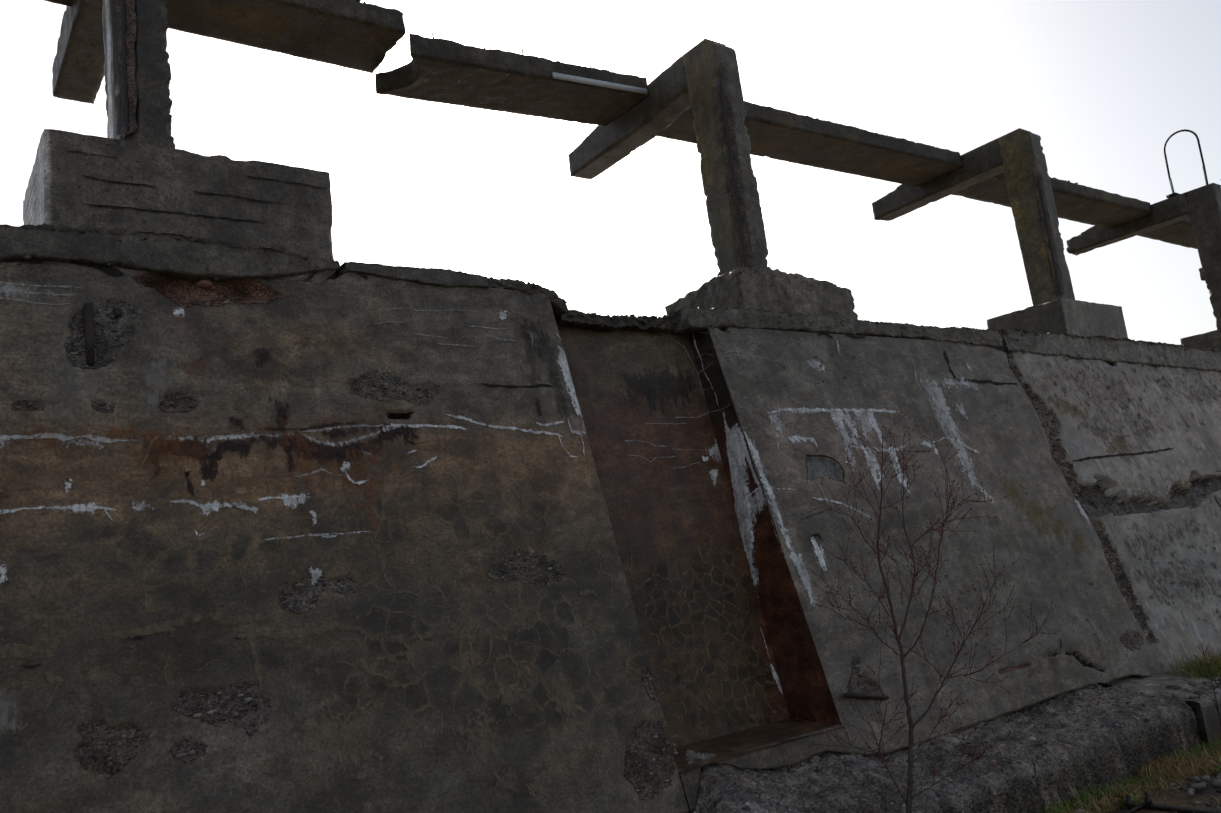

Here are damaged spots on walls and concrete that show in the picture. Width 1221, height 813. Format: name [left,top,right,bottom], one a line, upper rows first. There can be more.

spalling [132,272,286,307]
spalling [65,297,138,369]
spalling [347,370,442,420]
leakage [0,479,116,521]
leakage [170,478,317,538]
corrosion [138,396,420,481]
crack [374,414,586,458]
leakage [702,411,827,609]
leakage [768,407,910,493]
crack [1072,448,1221,519]
crack [117,546,782,776]
spalling [624,719,678,801]